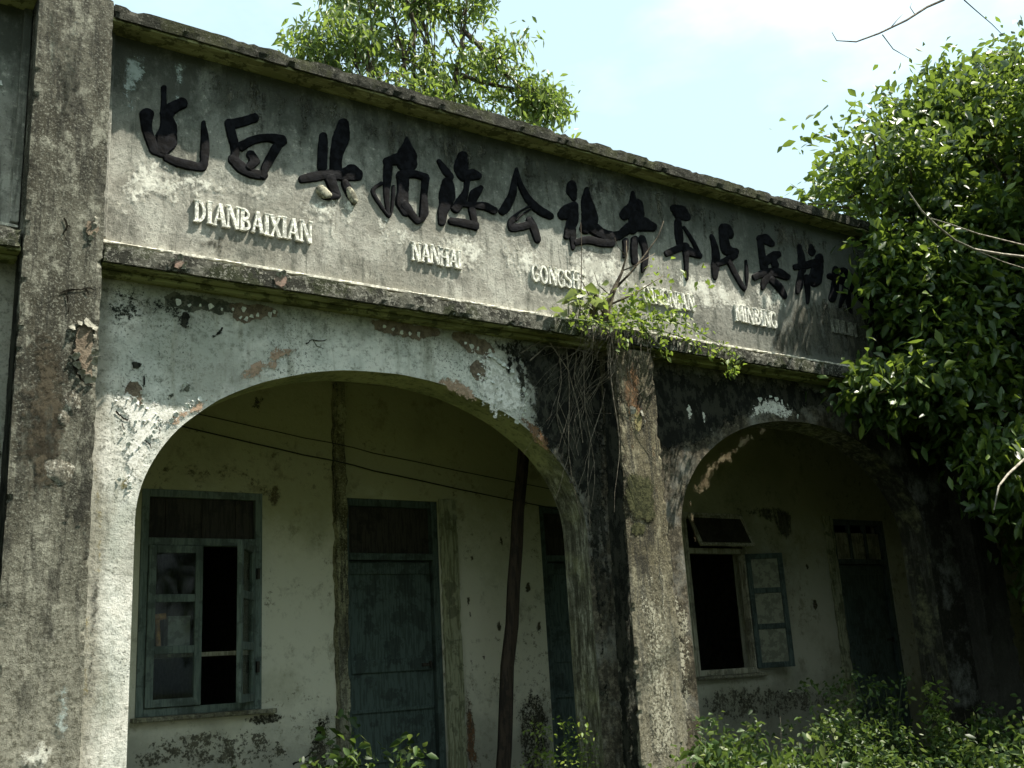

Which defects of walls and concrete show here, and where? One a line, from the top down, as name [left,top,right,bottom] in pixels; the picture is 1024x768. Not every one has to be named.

leakage [0,255,70,567]
spalling [69,317,100,386]
flaking render [114,361,207,498]
peeling [164,292,278,324]
peeling [241,346,296,380]
flaking render [371,319,528,424]
leakage [653,364,835,466]
leakage [494,339,691,768]
leakage [135,714,289,768]
leakage [703,685,828,720]